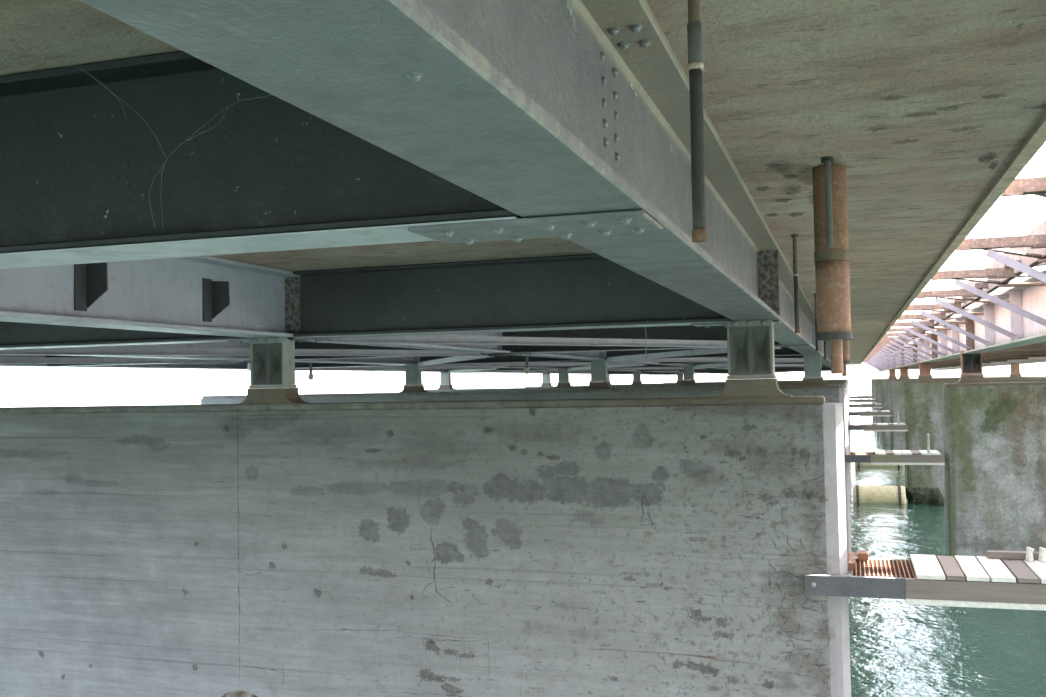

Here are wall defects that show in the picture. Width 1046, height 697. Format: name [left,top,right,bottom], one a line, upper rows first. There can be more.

crack [422,529,453,604]